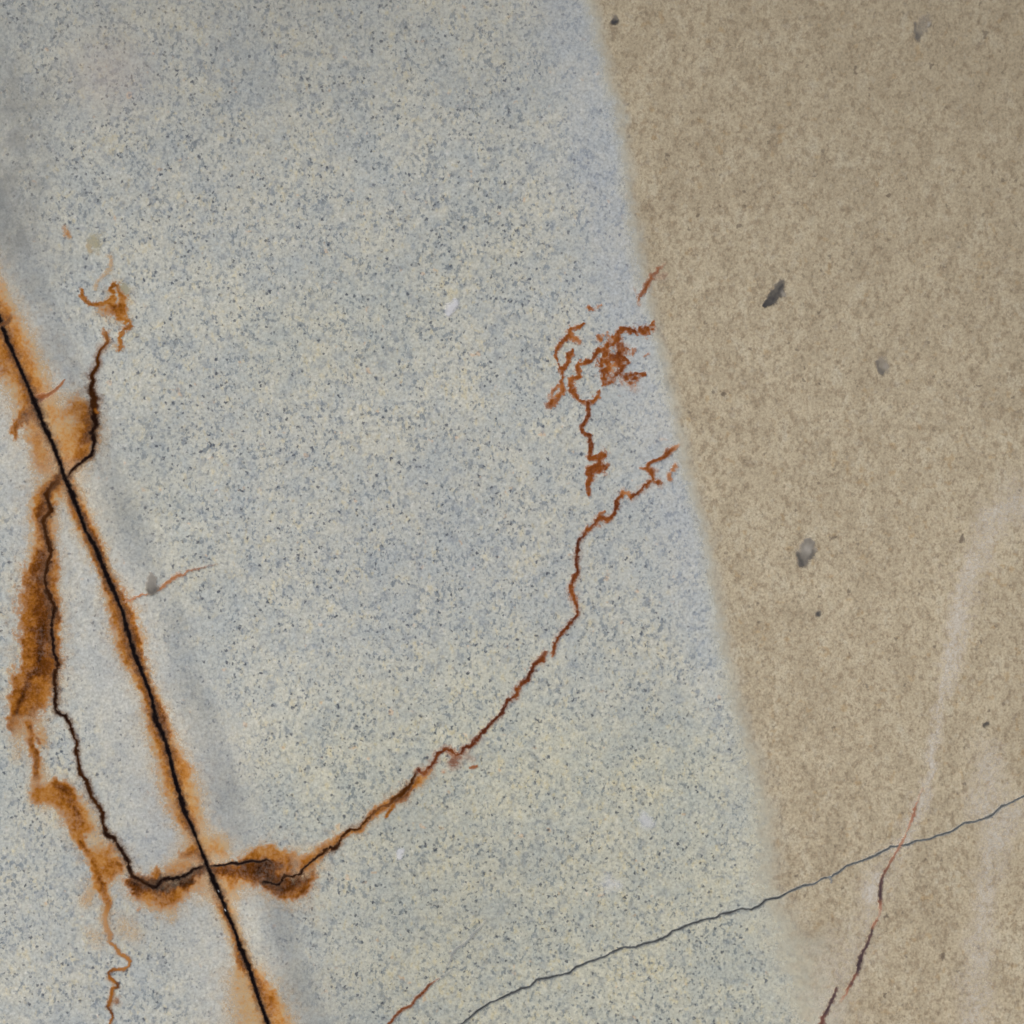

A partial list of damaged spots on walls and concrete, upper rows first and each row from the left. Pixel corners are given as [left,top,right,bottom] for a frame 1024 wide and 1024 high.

rust [78,236,133,352]
rust [545,304,655,496]
rust [637,266,663,302]
water stain [589,0,1024,1024]
rust [0,273,478,1024]
crack [0,314,679,1024]
crack [460,795,1024,1024]